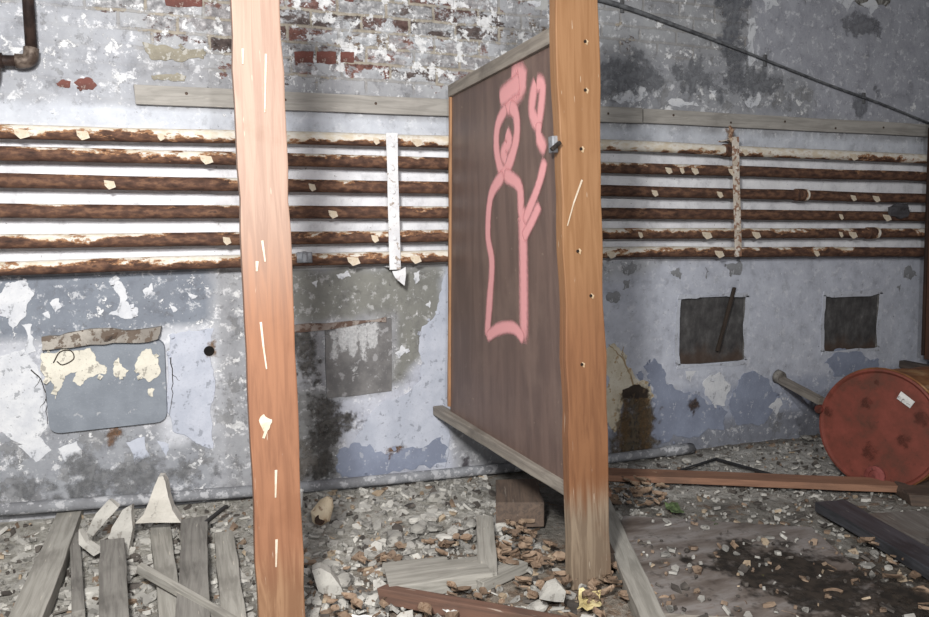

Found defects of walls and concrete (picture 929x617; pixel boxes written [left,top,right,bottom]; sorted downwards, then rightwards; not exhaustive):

spalling [56,77,97,91]
flaking render [142,42,206,62]
spalling [294,51,354,65]
peeling [611,86,648,104]
water stain [600,51,665,99]
peeling [668,98,699,108]
water stain [673,0,782,104]
peeling [745,17,758,67]
water stain [842,12,880,37]
peeling [0,276,215,463]
water stain [295,322,379,481]
peeling [606,343,654,433]